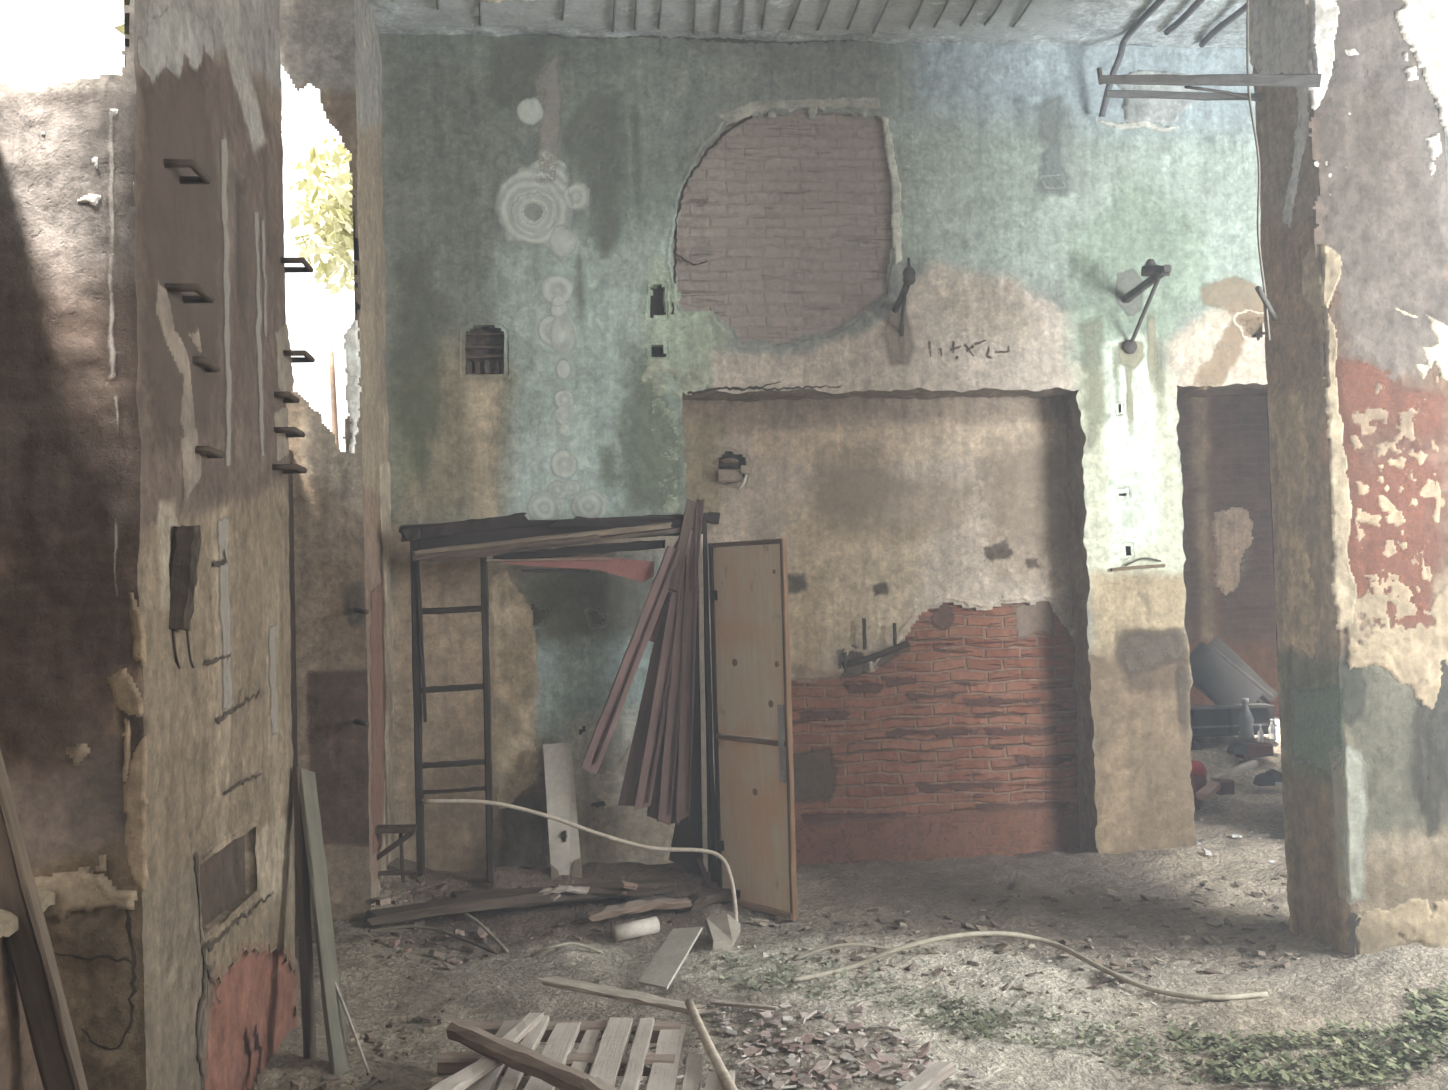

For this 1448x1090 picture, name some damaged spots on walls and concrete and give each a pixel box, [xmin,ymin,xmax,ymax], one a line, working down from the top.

flaking render [644,96,903,353]
peeling [642,338,713,513]
spalling [713,445,756,493]
spalling [868,579,892,600]
spalling [979,534,1045,573]
flaking render [1212,507,1254,595]
flaking render [1246,0,1448,709]
flaking render [34,592,149,921]
flaking render [765,592,1095,824]